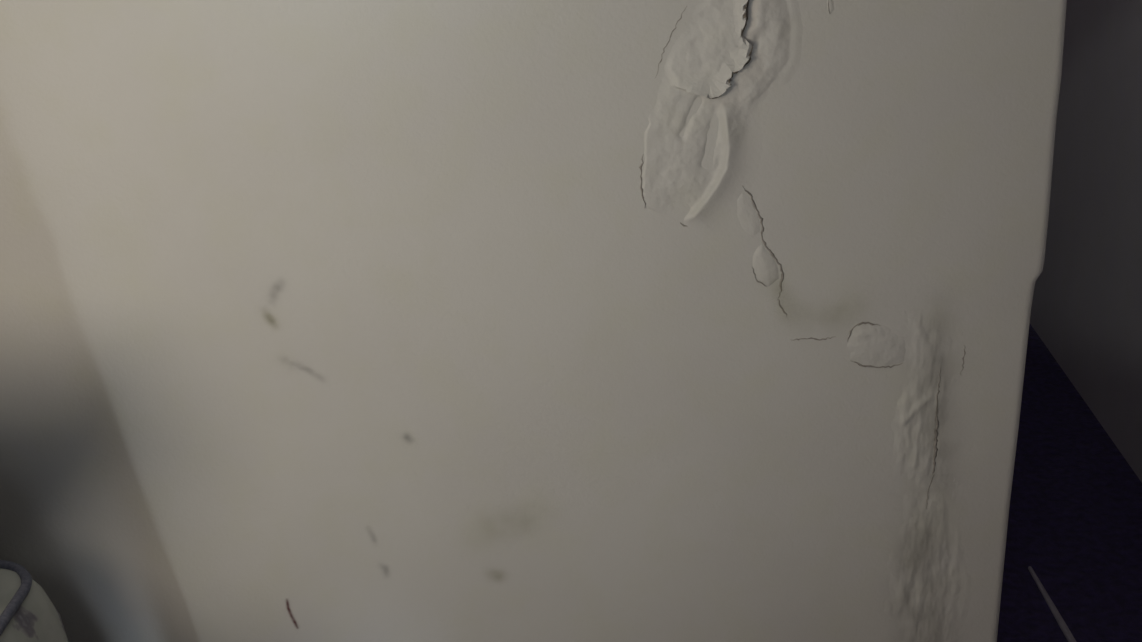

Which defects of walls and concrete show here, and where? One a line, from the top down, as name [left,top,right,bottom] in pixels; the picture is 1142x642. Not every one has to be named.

peeling [639,0,803,235]
crack [737,187,836,341]